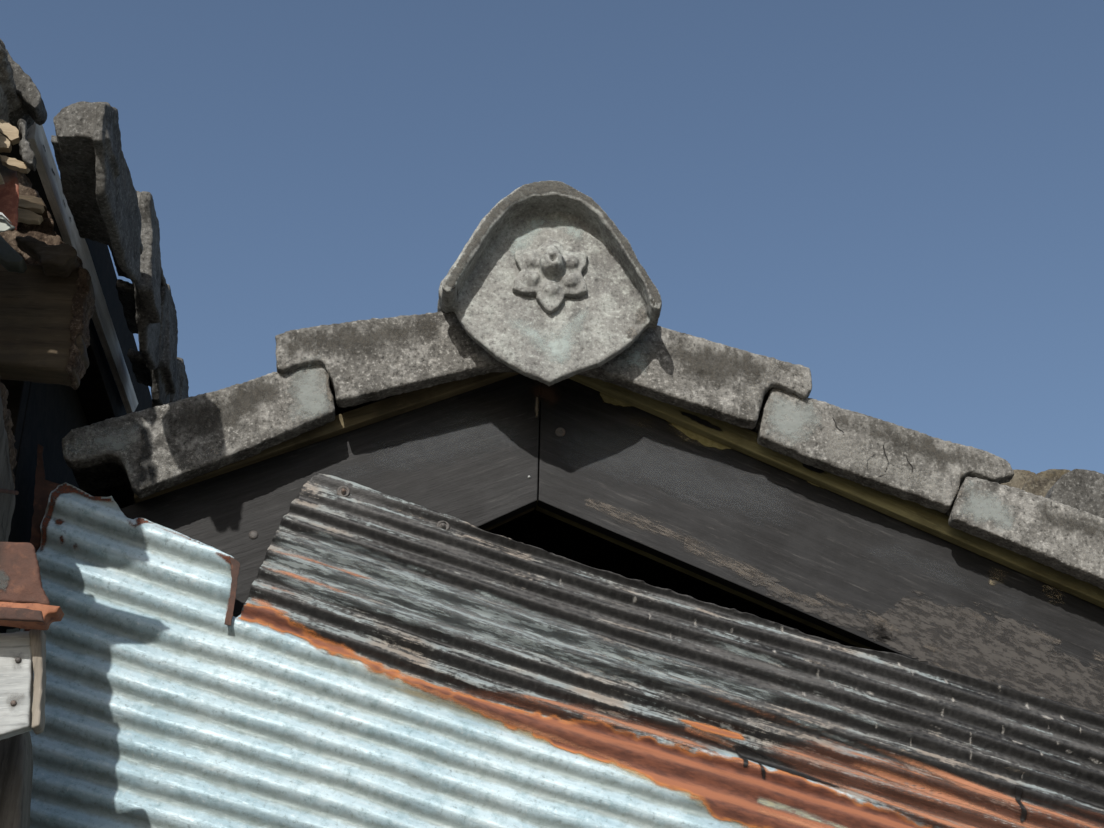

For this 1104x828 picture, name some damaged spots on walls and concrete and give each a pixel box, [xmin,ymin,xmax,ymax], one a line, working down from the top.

peeling [666,420,732,450]
corrosion [40,483,111,551]
corrosion [239,601,1104,828]